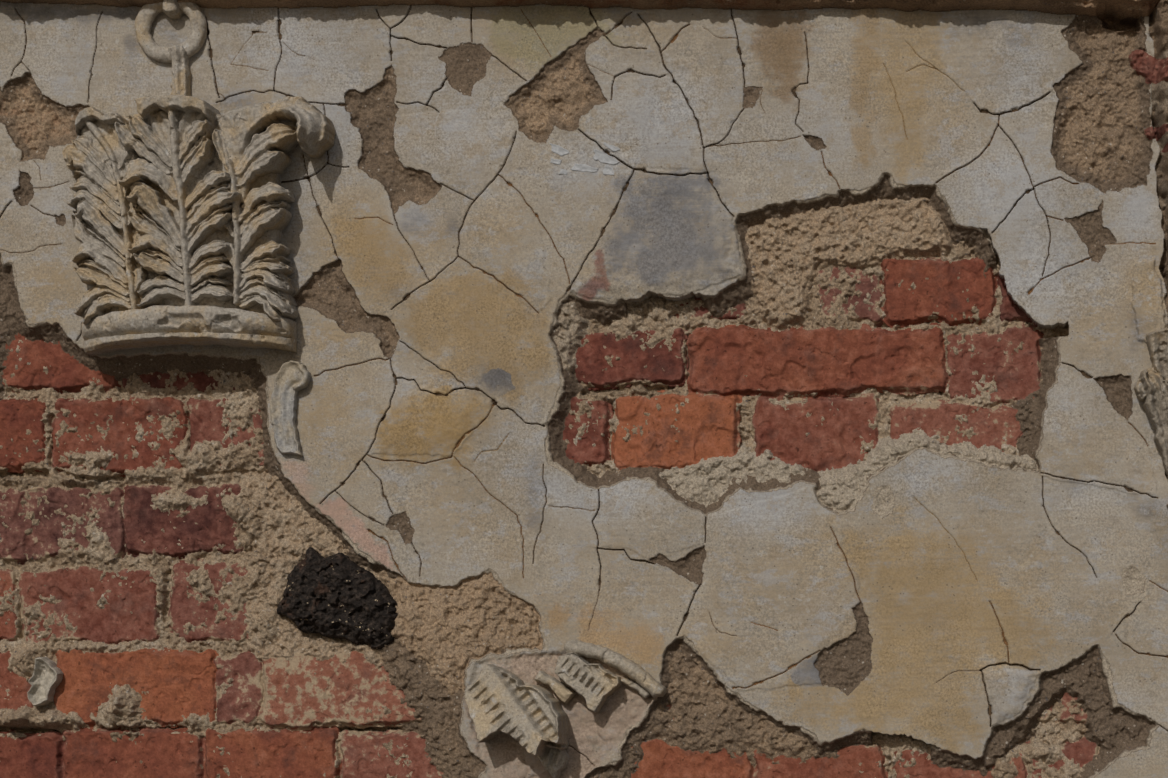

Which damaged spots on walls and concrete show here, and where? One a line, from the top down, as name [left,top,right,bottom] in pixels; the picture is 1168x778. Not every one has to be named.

crack [206,7,345,116]
spalling [344,64,442,214]
spalling [503,27,620,175]
crack [355,6,840,314]
crack [883,42,1156,295]
spalling [1051,15,1168,263]
spalling [544,172,1069,516]
spalling [0,253,544,778]
crack [314,341,654,630]
spalling [584,635,1160,778]
crack [914,497,1040,727]
crack [1042,473,1158,578]